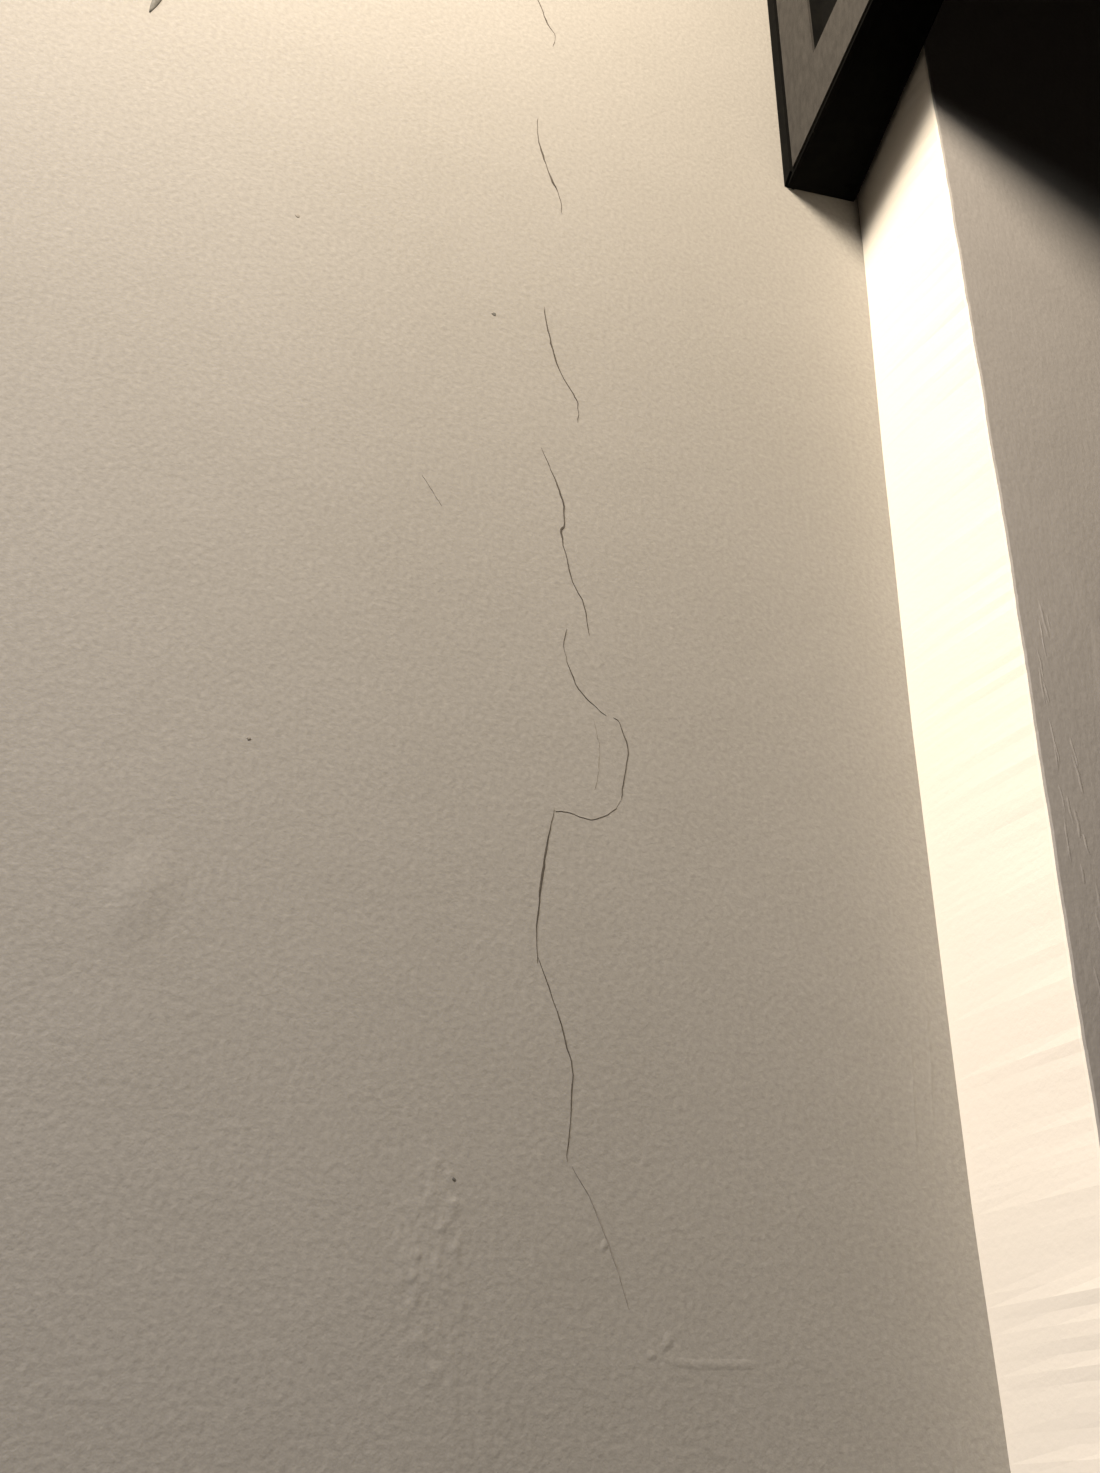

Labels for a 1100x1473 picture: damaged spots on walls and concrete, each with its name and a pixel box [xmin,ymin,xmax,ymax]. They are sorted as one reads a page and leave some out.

crack [537,119,562,213]
crack [544,307,579,420]
crack [536,448,629,1309]